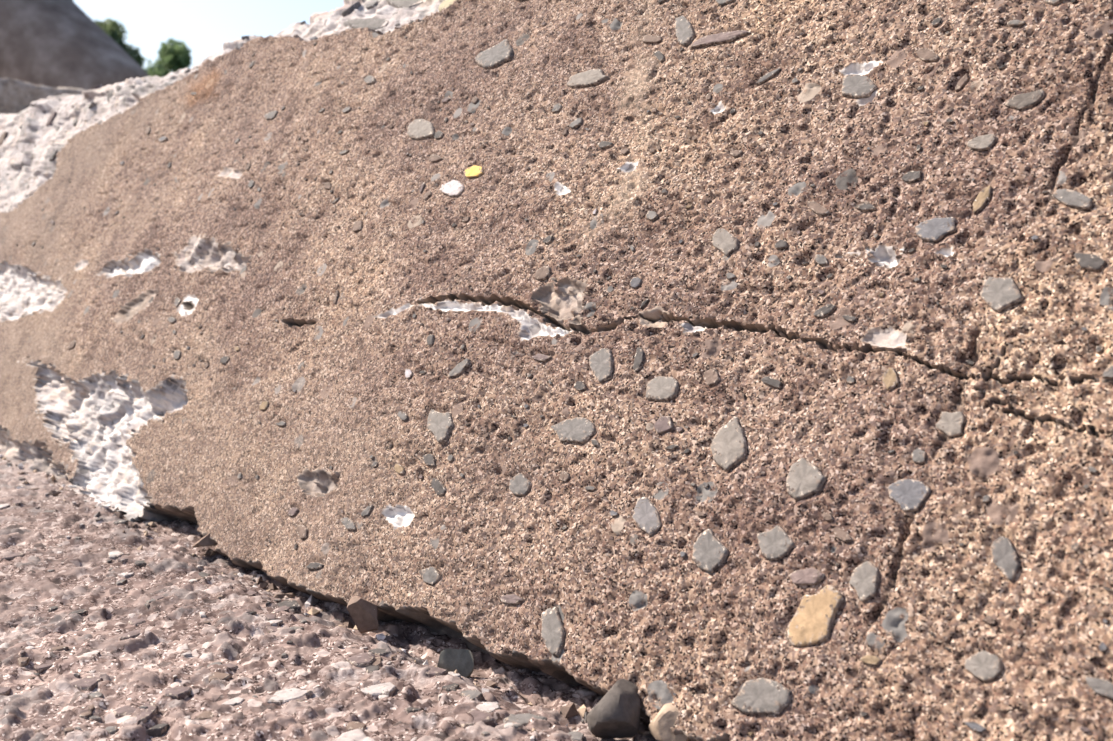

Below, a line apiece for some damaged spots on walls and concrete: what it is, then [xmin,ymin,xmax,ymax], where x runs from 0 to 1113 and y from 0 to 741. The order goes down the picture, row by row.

peeling [839,60,883,76]
spalling [0,0,461,213]
peeling [710,100,727,115]
peeling [553,181,571,196]
peeling [73,233,254,278]
peeling [835,244,904,268]
peeling [935,245,954,257]
spalling [0,260,67,322]
peeling [110,289,159,325]
crack [281,318,316,328]
crack [371,277,1113,438]
spalling [0,356,189,522]